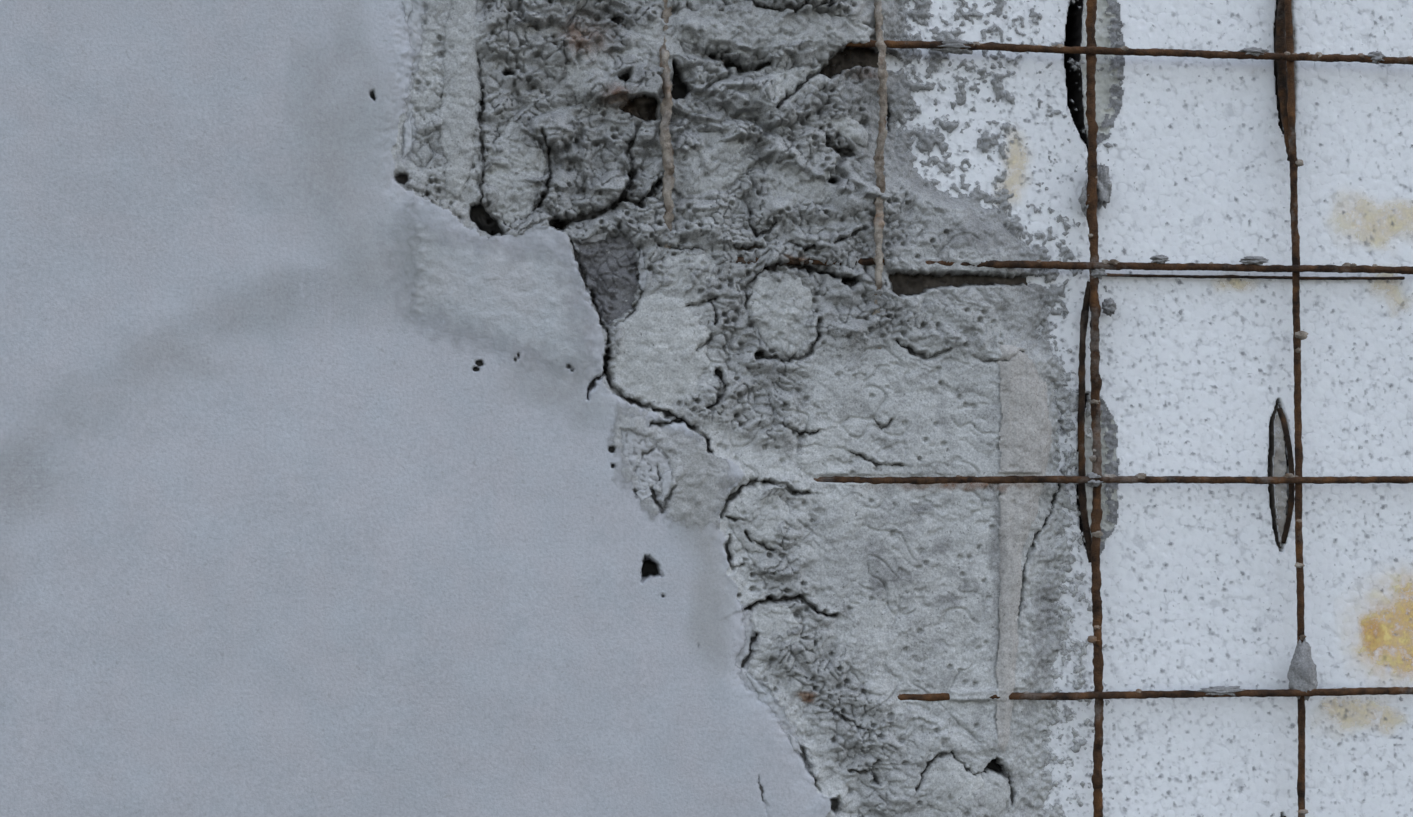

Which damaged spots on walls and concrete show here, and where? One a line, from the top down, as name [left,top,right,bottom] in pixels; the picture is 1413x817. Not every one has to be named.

hole [621,63,687,121]
hole [816,47,879,79]
spalling [825,135,855,157]
peeling [404,203,647,374]
crack [533,136,861,513]
hole [888,272,1034,296]
peeling [609,406,741,529]
crack [720,480,810,566]
spalling [641,558,659,577]
crack [741,595,836,668]
rust [1361,583,1413,672]
spalling [984,759,1003,773]